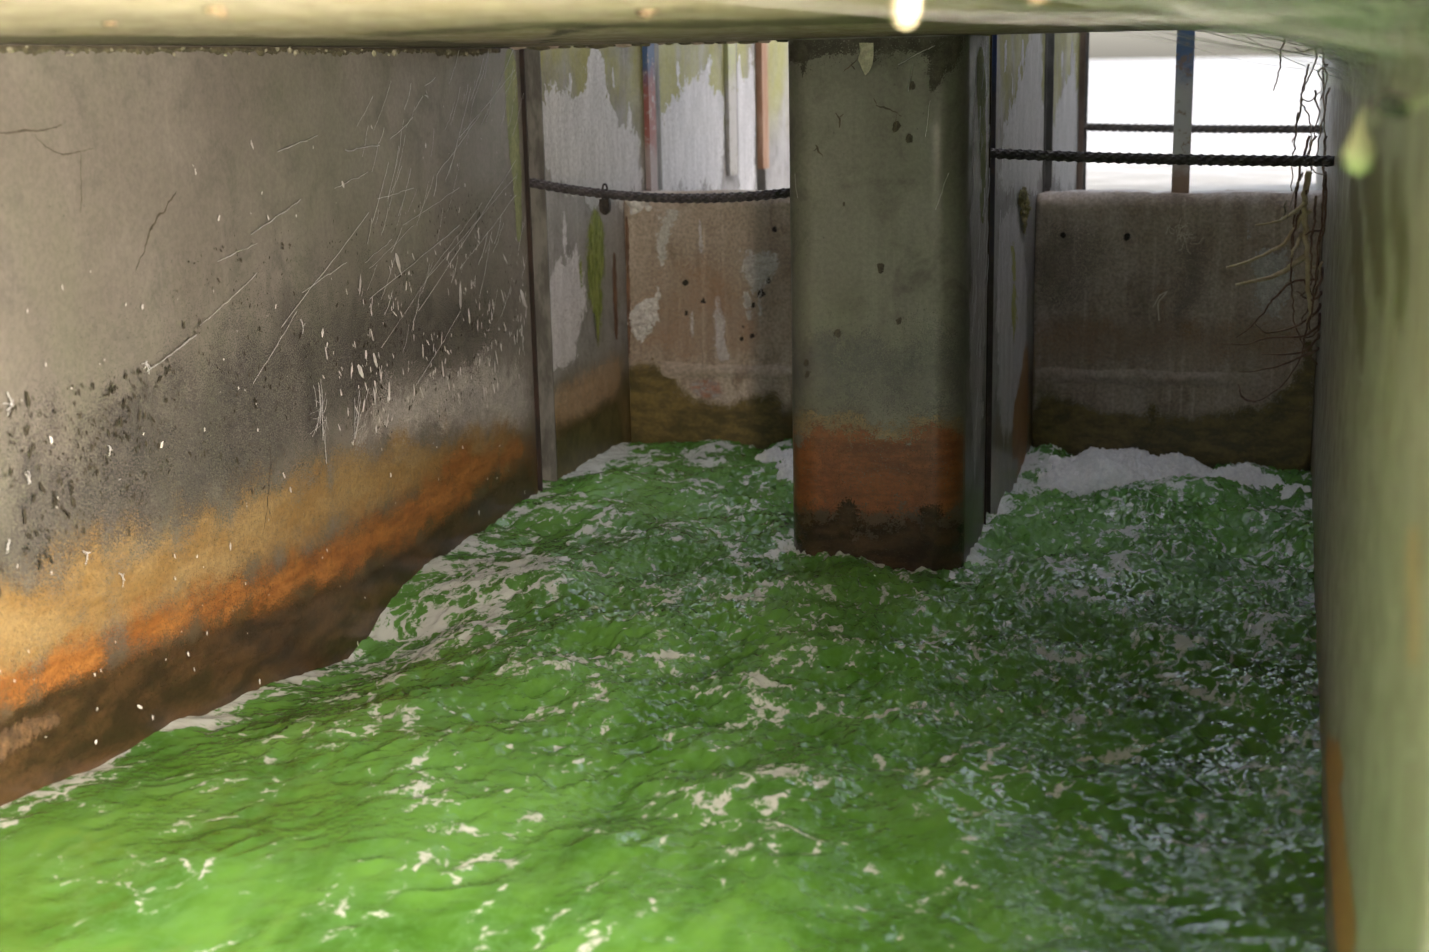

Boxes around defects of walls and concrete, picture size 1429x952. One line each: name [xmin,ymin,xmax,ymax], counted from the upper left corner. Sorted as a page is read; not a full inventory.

crack [0,124,88,211]
water stain [0,205,537,806]
water stain [0,0,1135,488]
corrosion [793,412,965,525]